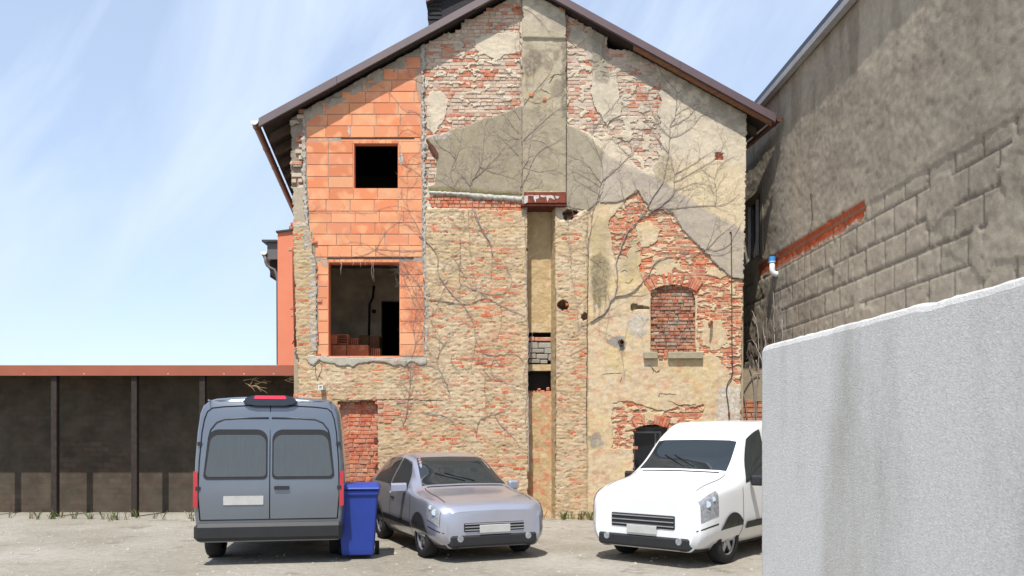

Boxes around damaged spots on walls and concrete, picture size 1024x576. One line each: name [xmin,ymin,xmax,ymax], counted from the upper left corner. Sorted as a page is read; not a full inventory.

spalling [418,0,559,211]
spalling [565,14,662,172]
peeling [307,354,427,368]
spalling [611,401,705,449]
spalling [608,191,744,385]